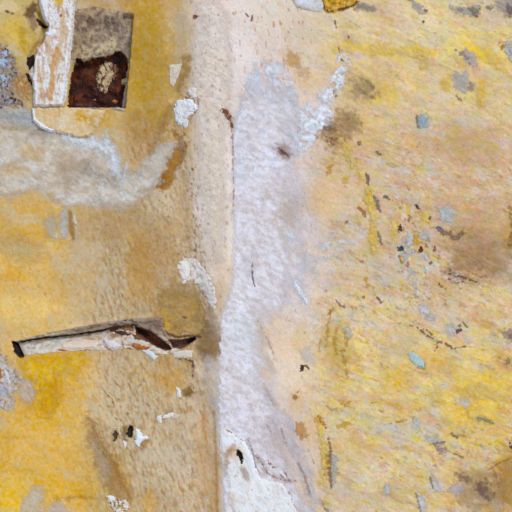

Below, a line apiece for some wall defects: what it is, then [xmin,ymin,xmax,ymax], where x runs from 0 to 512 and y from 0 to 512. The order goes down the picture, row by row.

spalling [0,47,23,109]
peeling [26,0,134,138]
water stain [0,107,175,209]
spalling [173,87,200,129]
spalling [12,258,217,360]
water stain [197,54,353,512]
hole [111,424,149,448]
peeling [219,429,298,512]